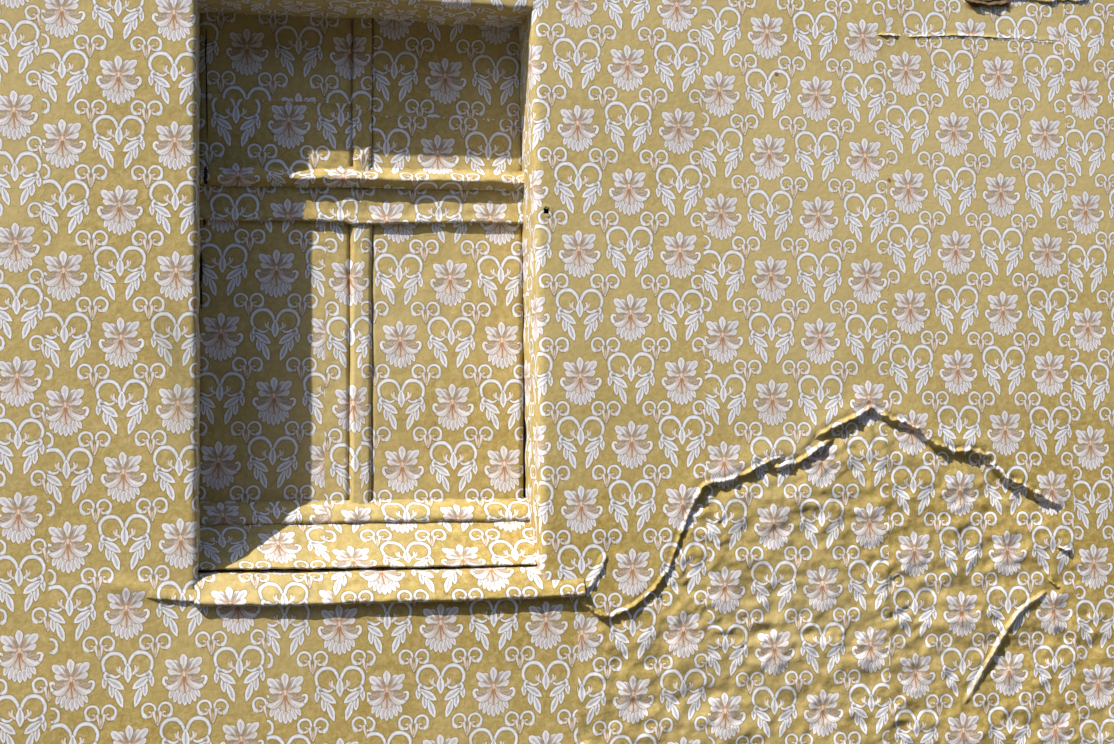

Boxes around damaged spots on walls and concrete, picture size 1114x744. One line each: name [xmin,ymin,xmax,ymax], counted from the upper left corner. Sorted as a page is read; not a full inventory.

flaking render [965,0,1089,8]